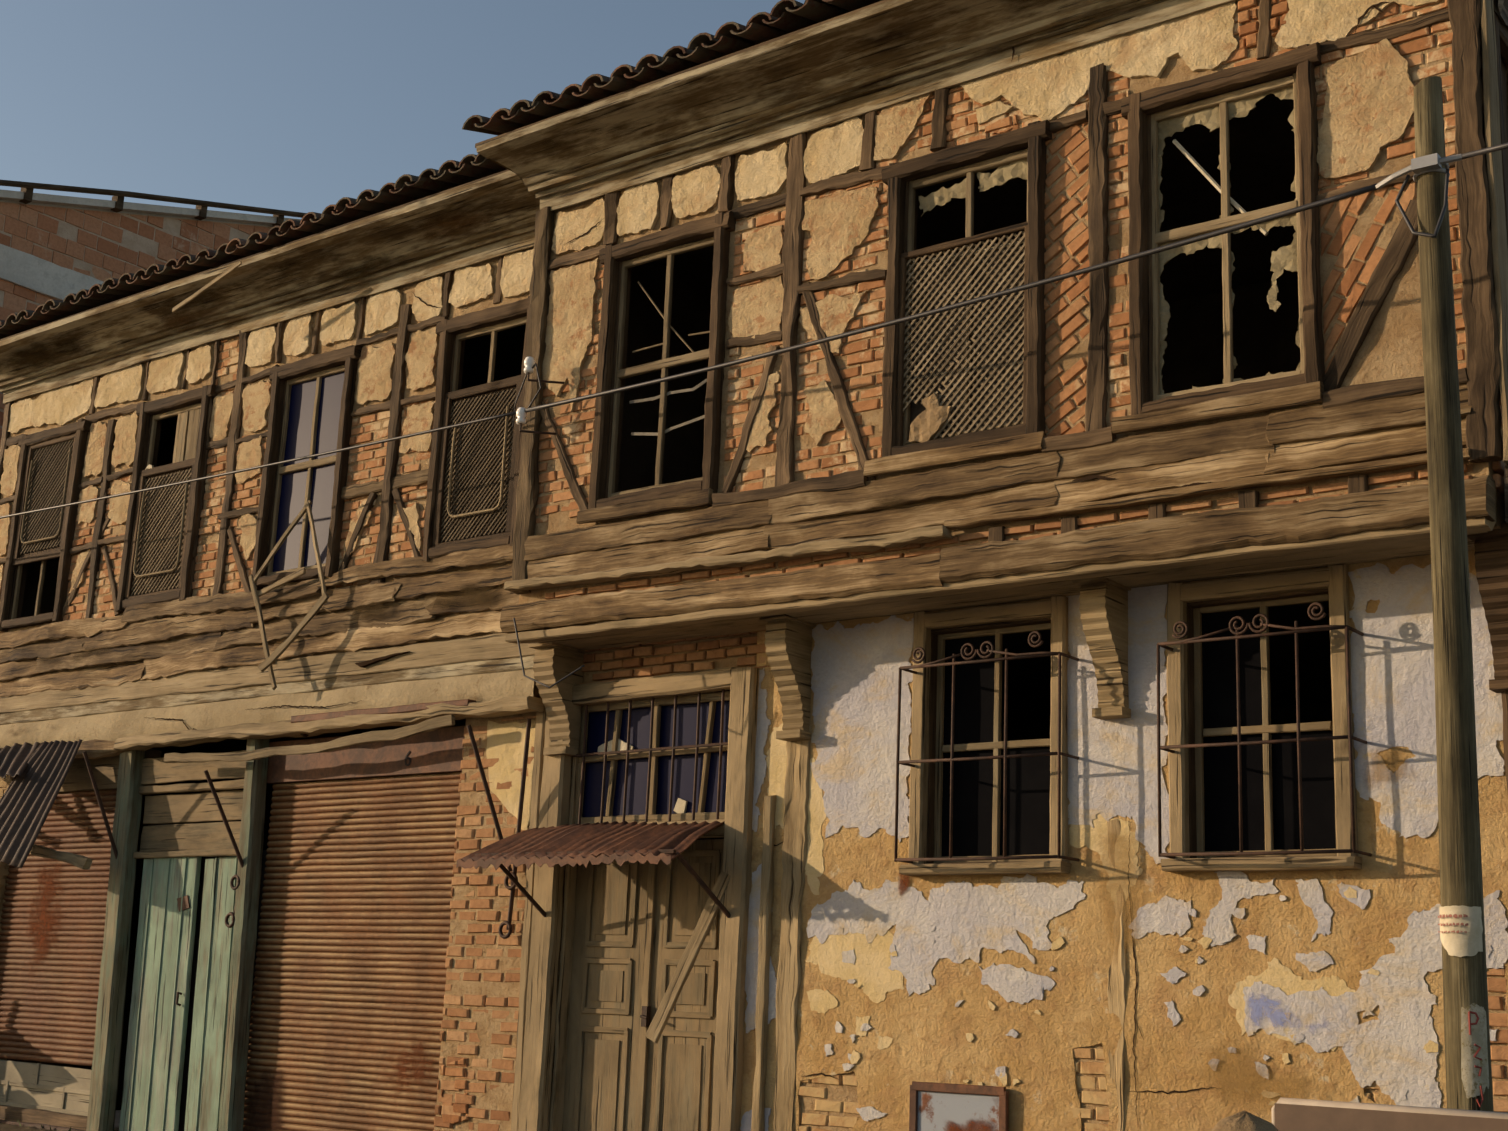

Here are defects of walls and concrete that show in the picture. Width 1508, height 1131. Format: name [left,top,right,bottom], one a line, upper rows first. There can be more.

spalling [946,101,1018,142]
spalling [1238,0,1289,50]
peeling [740,1108,771,1131]
peeling [752,668,787,832]
peeling [798,615,1086,1131]
spalling [1072,1043,1114,1131]
crack [1125,822,1221,1122]
peeling [1066,563,1442,1108]
peeling [1469,573,1505,779]
spalling [1483,890,1508,1113]